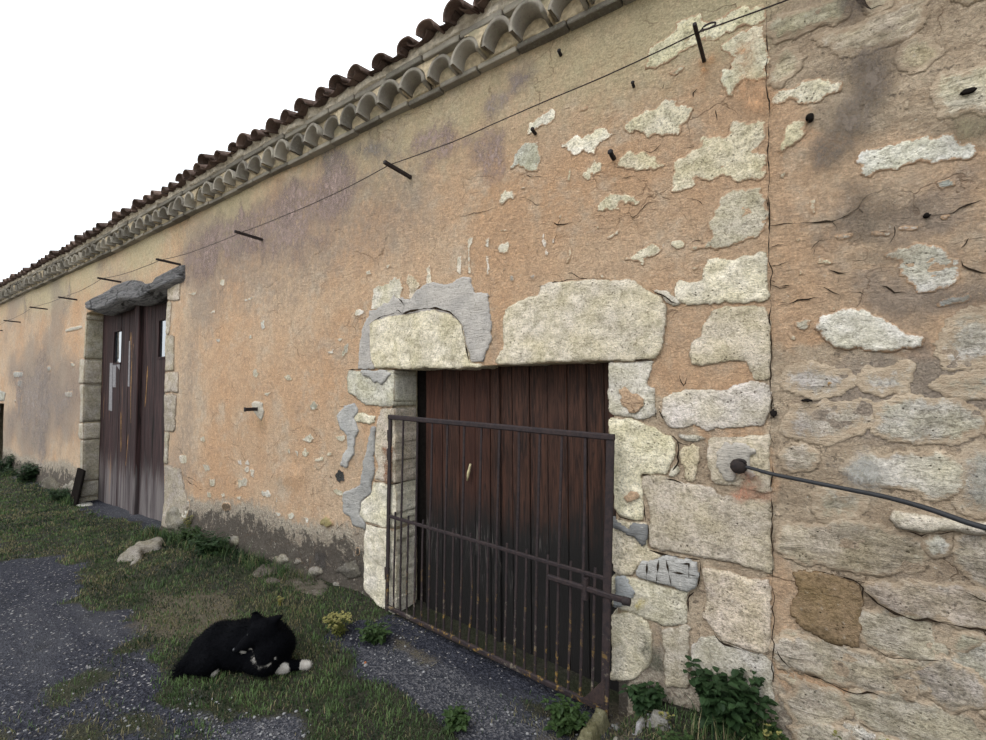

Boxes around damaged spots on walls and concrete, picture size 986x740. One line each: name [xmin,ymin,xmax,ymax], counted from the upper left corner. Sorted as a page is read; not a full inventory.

peeling [645,5,771,97]
peeling [770,77,843,105]
peeling [510,107,556,172]
peeling [561,98,694,182]
peeling [499,187,526,205]
peeling [596,192,654,240]
peeling [617,119,808,266]
crack [931,200,981,216]
crack [768,187,901,305]
crack [959,236,986,273]
peeling [354,264,433,317]
peeling [619,387,644,413]